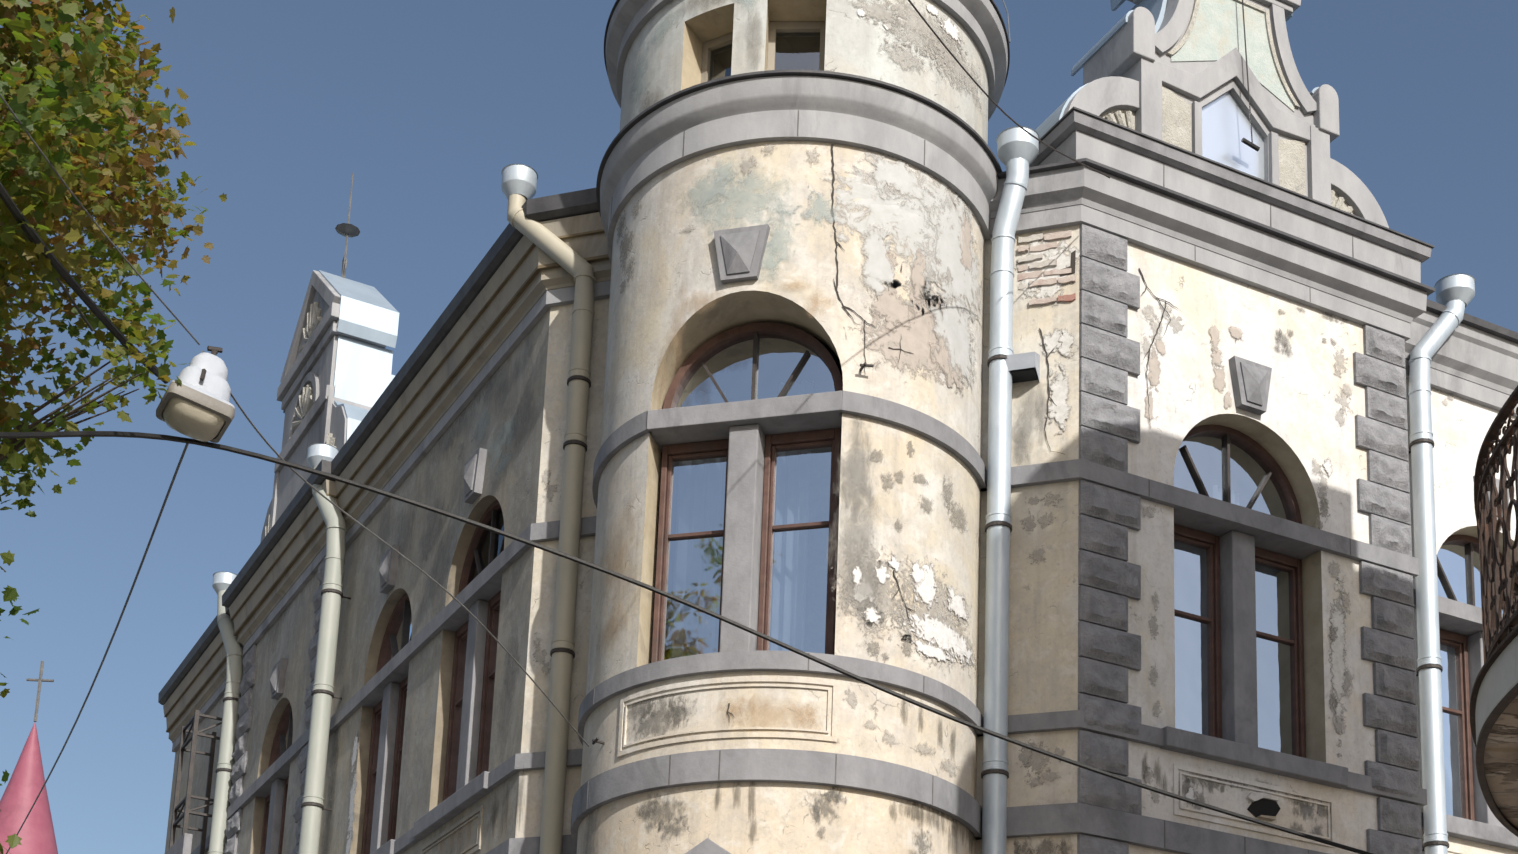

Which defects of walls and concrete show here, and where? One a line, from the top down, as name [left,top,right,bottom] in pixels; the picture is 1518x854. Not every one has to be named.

peeling [926,4,965,46]
crack [831,144,914,375]
peeling [794,150,981,396]
flaking render [1014,230,1080,308]
peeling [1040,328,1074,434]
crack [1139,268,1178,421]
peeling [849,555,977,670]